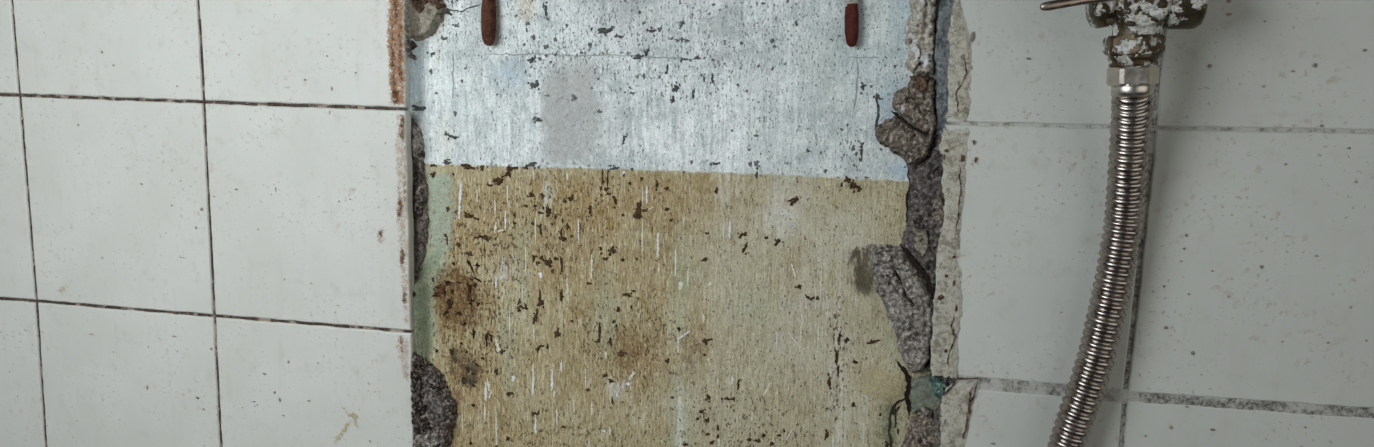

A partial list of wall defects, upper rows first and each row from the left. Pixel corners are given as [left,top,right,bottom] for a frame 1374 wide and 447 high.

peeling [515,14,569,97]
peeling [576,26,624,56]
peeling [620,0,726,104]
leakage [413,174,508,355]
flaking render [403,0,539,447]
peeling [513,165,673,324]
peeling [840,0,981,447]
peeling [594,290,636,356]
peeling [696,379,740,445]
peeling [827,332,858,390]